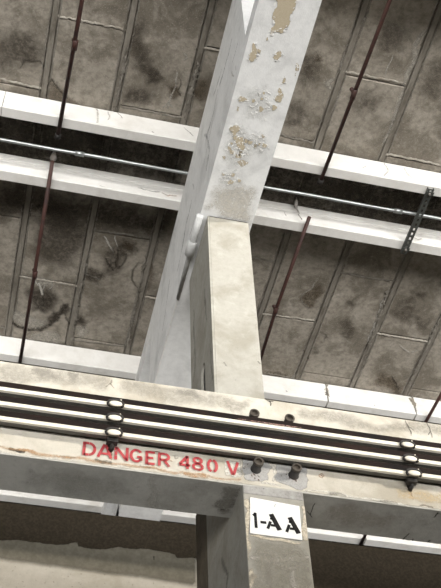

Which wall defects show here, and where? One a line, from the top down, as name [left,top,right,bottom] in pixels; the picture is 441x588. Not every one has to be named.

peeling [266,0,299,40]
damp [131,25,162,82]
peeling [247,43,261,62]
peeling [229,124,248,167]
damp [85,236,133,282]
damp [12,278,87,343]